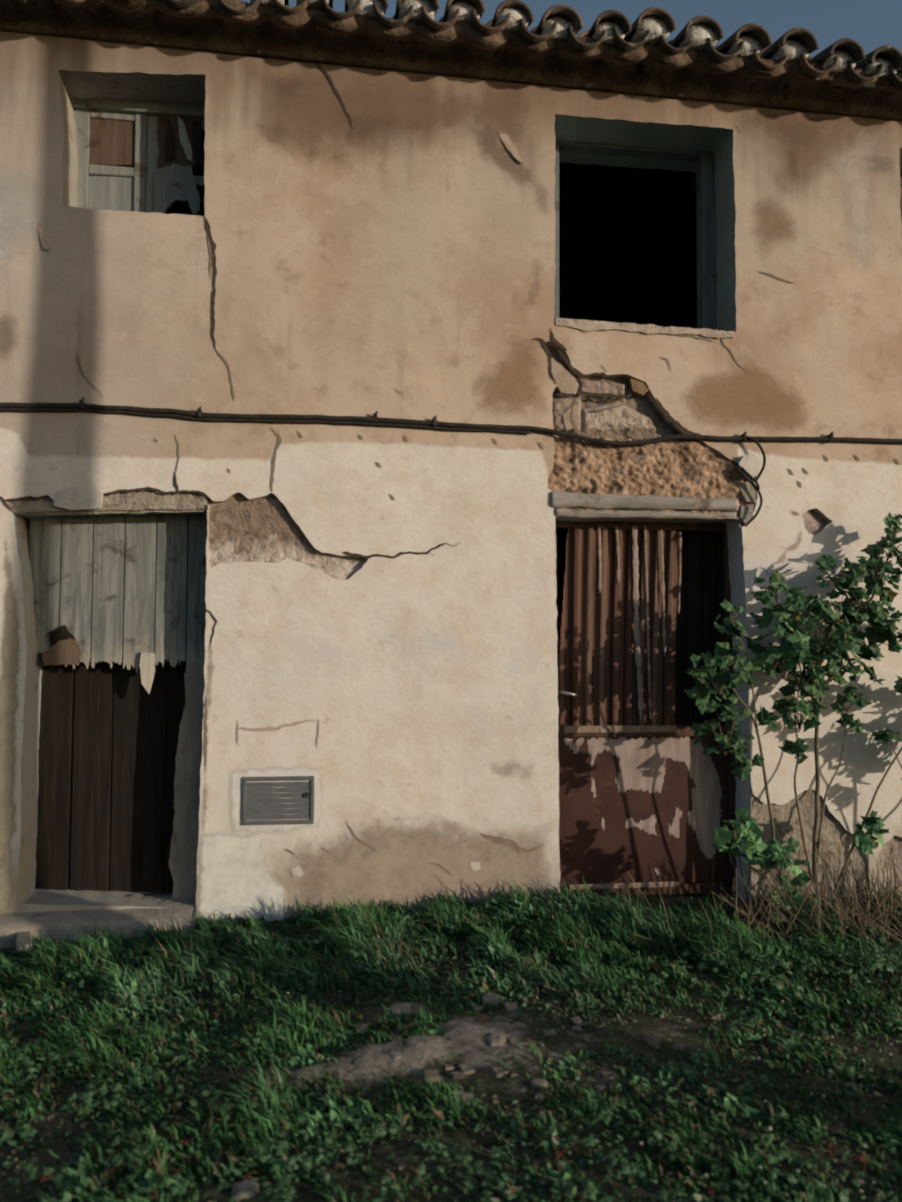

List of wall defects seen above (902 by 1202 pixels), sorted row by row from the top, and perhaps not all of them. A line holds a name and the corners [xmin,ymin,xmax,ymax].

crack [316,61,354,129]
crack [203,216,235,401]
leakage [488,351,534,408]
leakage [691,370,800,428]
flaking render [538,345,760,527]
flaking render [5,486,368,580]
crack [343,543,459,559]
flaking render [775,510,828,564]
crack [205,608,217,649]
peeling [0,557,19,913]
crack [237,719,320,749]
flaking render [749,787,902,912]